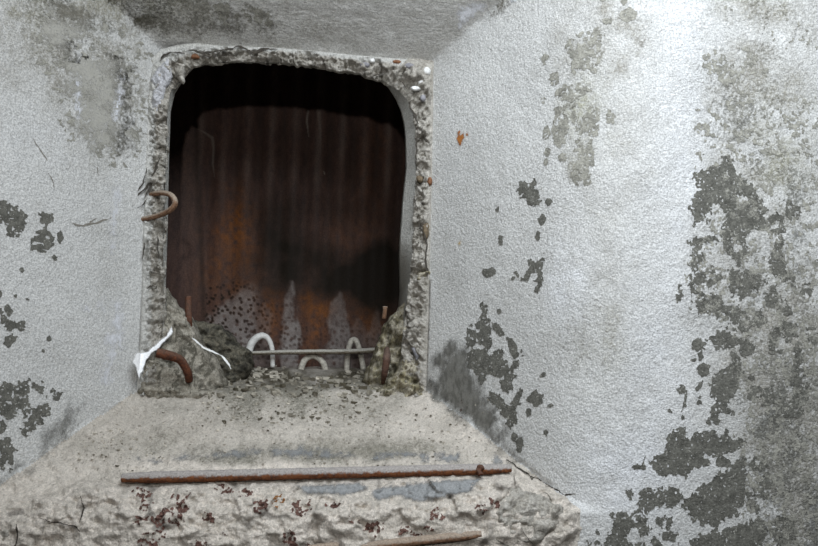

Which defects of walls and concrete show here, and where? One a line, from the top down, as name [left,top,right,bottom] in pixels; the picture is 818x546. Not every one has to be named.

water stain [130,1,245,38]
water stain [37,0,148,157]
peeling [0,200,28,237]
spalling [30,0,434,397]
peeling [516,178,553,241]
peeling [0,290,29,348]
peeling [586,46,818,546]
peeling [0,378,63,473]
water stain [432,341,500,440]
peeling [464,301,554,453]
spalling [0,469,582,546]
rust [121,463,512,546]